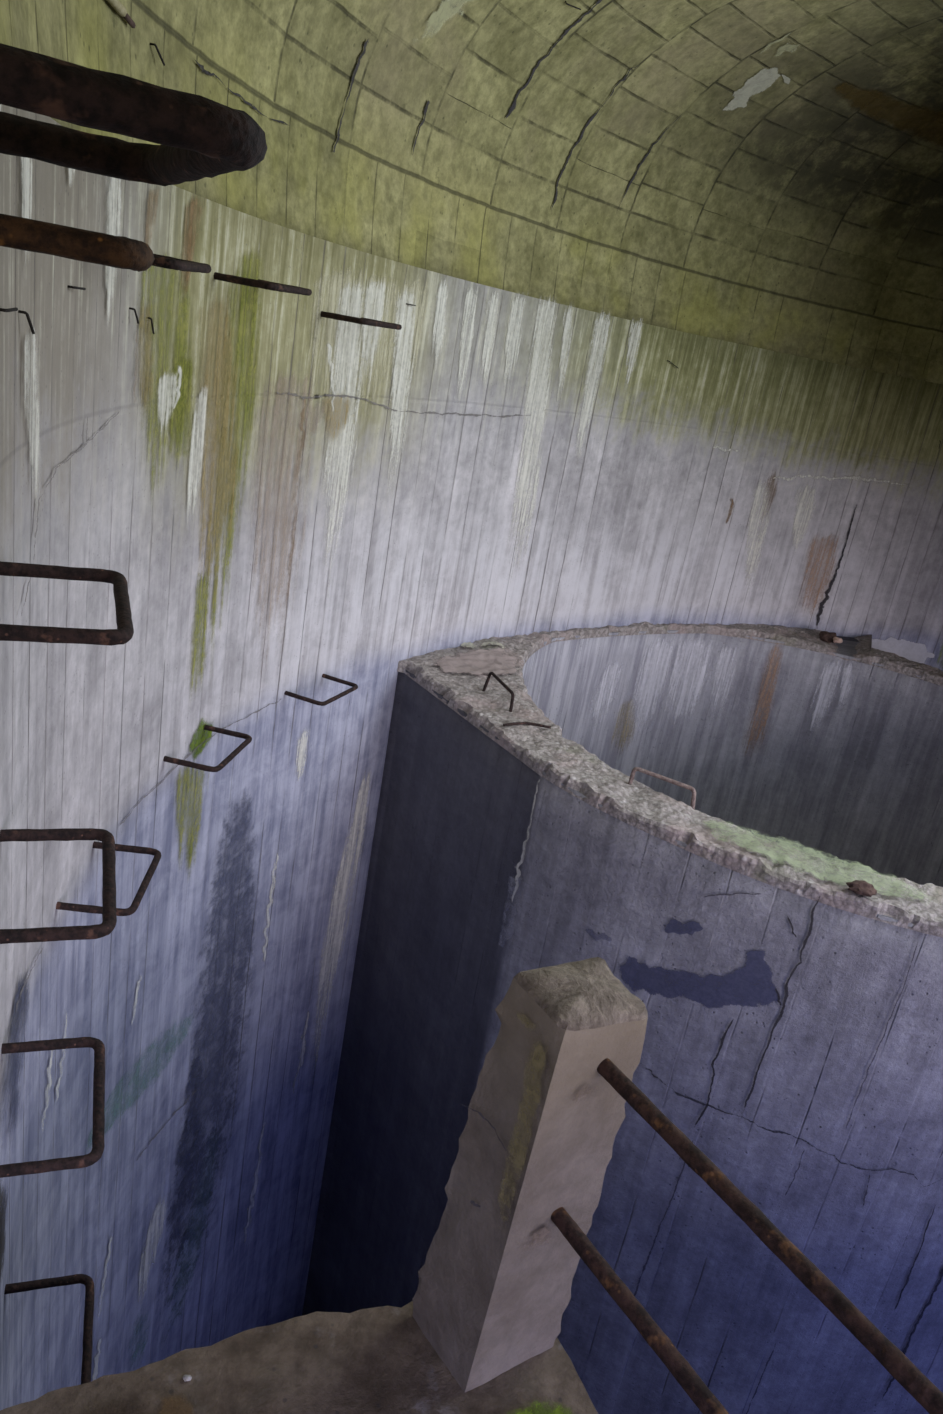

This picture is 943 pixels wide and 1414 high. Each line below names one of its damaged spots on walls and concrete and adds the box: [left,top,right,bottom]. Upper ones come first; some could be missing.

crack [506,0,602,118]
peeling [723,33,798,111]
leakage [140,252,261,687]
crack [267,391,527,418]
leakage [311,271,572,549]
leakage [577,316,610,453]
leakage [626,322,642,382]
crack [816,505,857,625]
crack [705,891,760,899]
leakage [619,950,778,1008]
leakage [138,798,278,1301]
crack [634,897,943,1397]